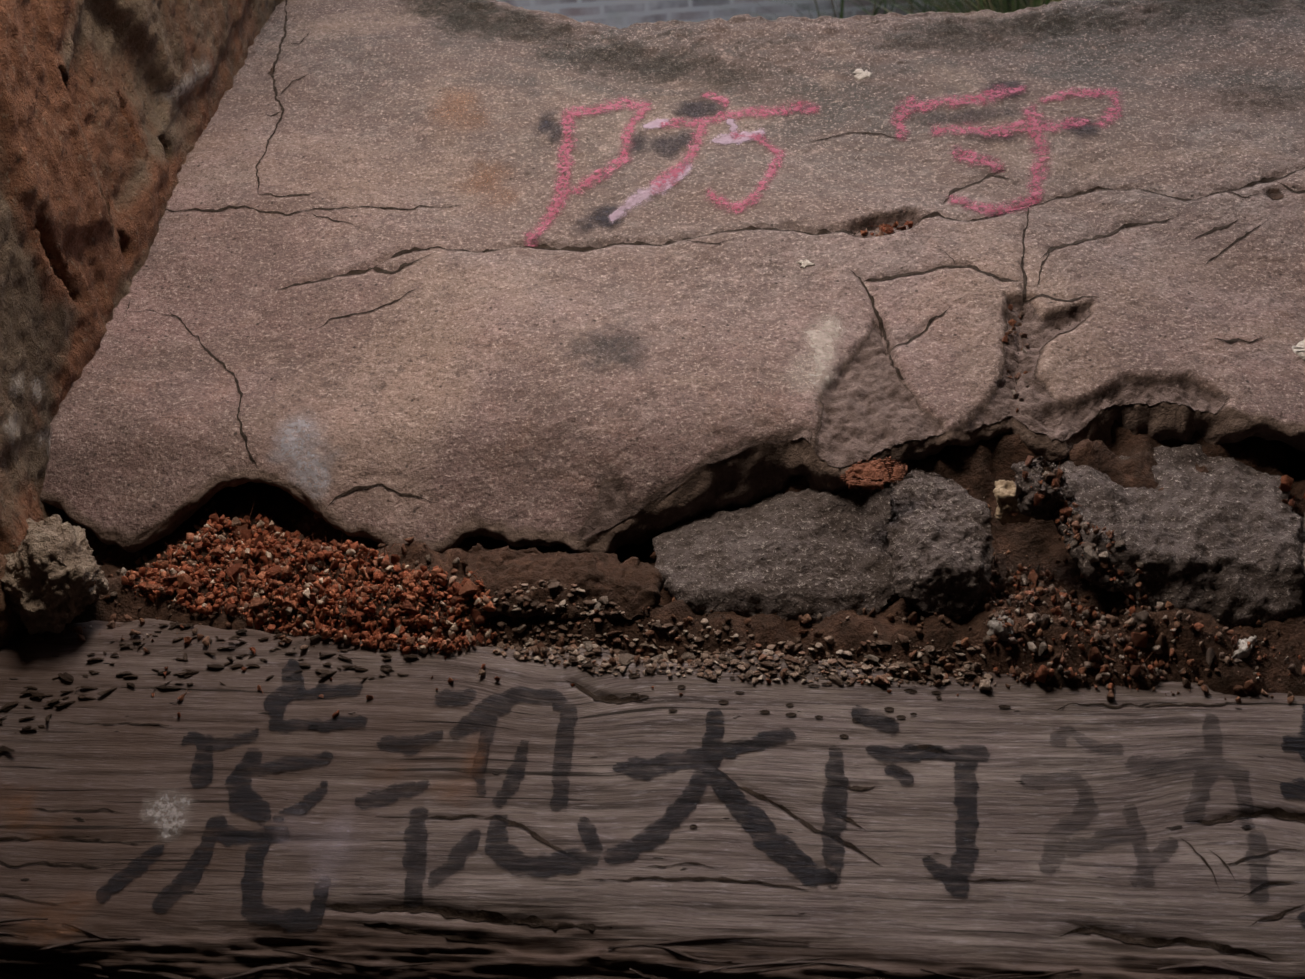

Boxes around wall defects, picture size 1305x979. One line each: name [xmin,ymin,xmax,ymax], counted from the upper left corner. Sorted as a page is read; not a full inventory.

crack [165,0,456,226]
crack [814,132,914,141]
crack [272,225,873,330]
crack [849,167,1305,389]
crack [122,301,257,468]